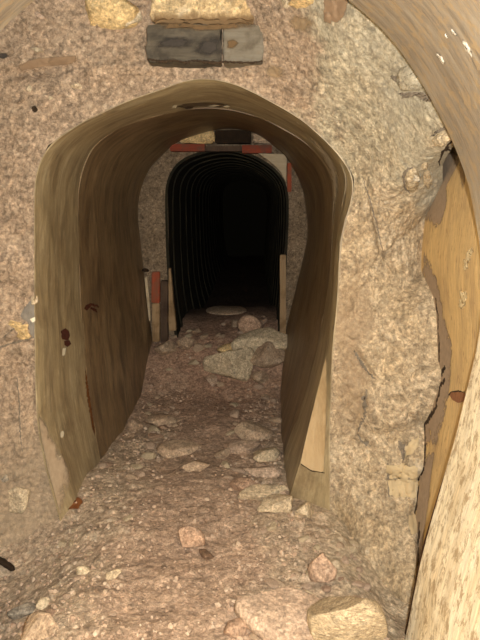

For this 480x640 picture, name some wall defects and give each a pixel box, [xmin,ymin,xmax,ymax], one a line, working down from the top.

rust [61,328,71,356]